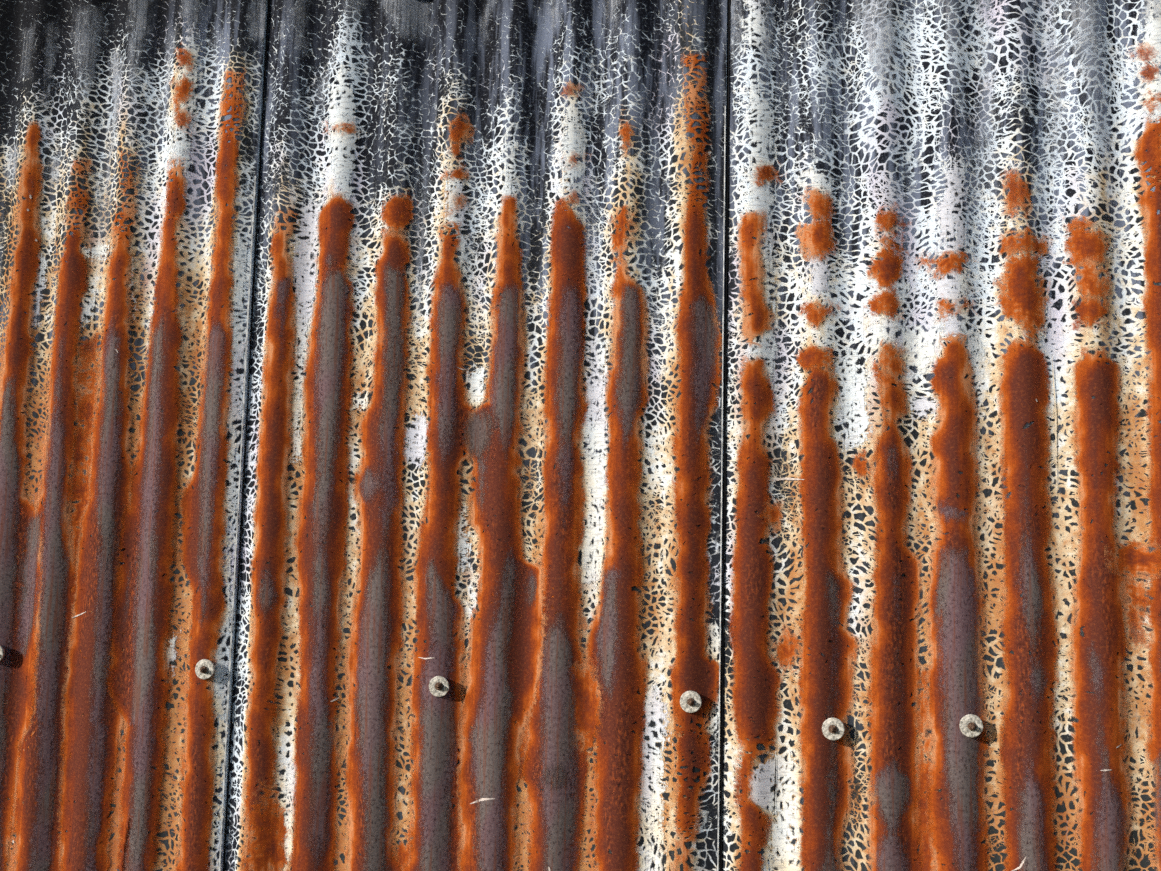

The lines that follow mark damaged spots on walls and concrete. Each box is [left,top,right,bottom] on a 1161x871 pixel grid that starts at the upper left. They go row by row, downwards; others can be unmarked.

rust [172,48,194,127]
rust [440,114,474,180]
rust [0,70,246,871]
peeling [260,572,277,613]
crack [256,543,315,835]
crack [281,412,320,519]
rust [241,190,649,871]
crack [445,426,503,704]
crack [578,728,620,871]
crack [575,476,624,663]
rust [669,46,1161,871]
crack [1106,571,1158,871]